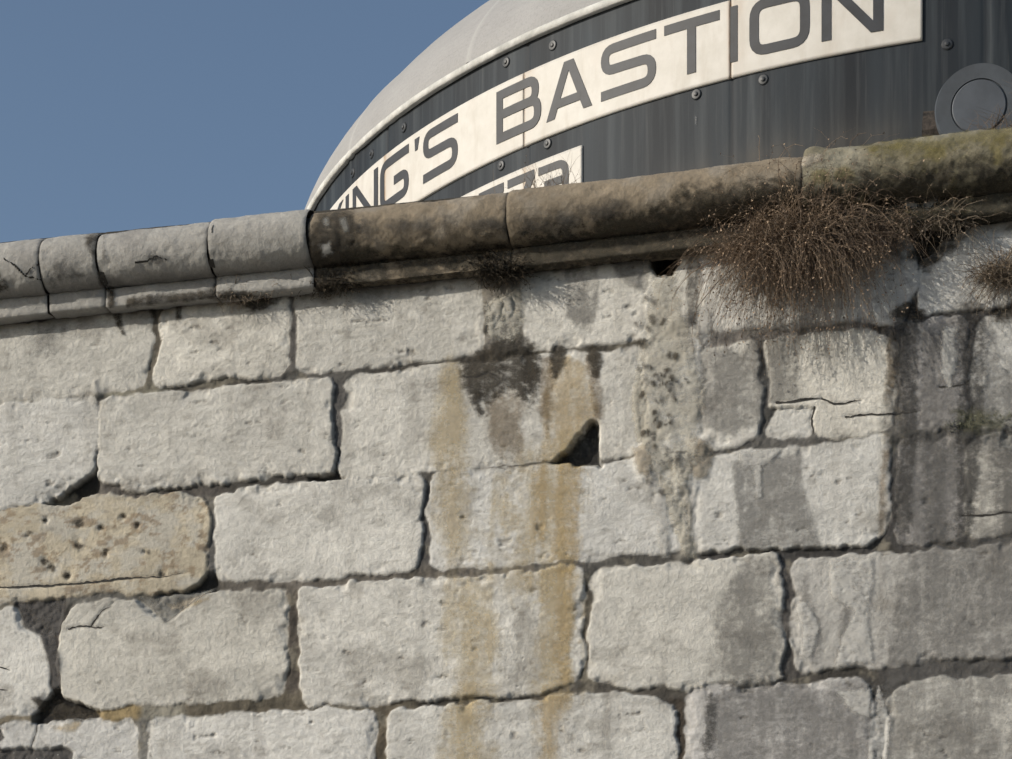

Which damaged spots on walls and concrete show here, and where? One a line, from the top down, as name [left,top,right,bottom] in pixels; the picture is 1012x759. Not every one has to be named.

crack [4,258,41,280]
water stain [308,156,1012,558]
crack [775,398,916,432]
spalling [557,424,601,467]
crack [0,573,180,630]
spalling [0,730,73,759]